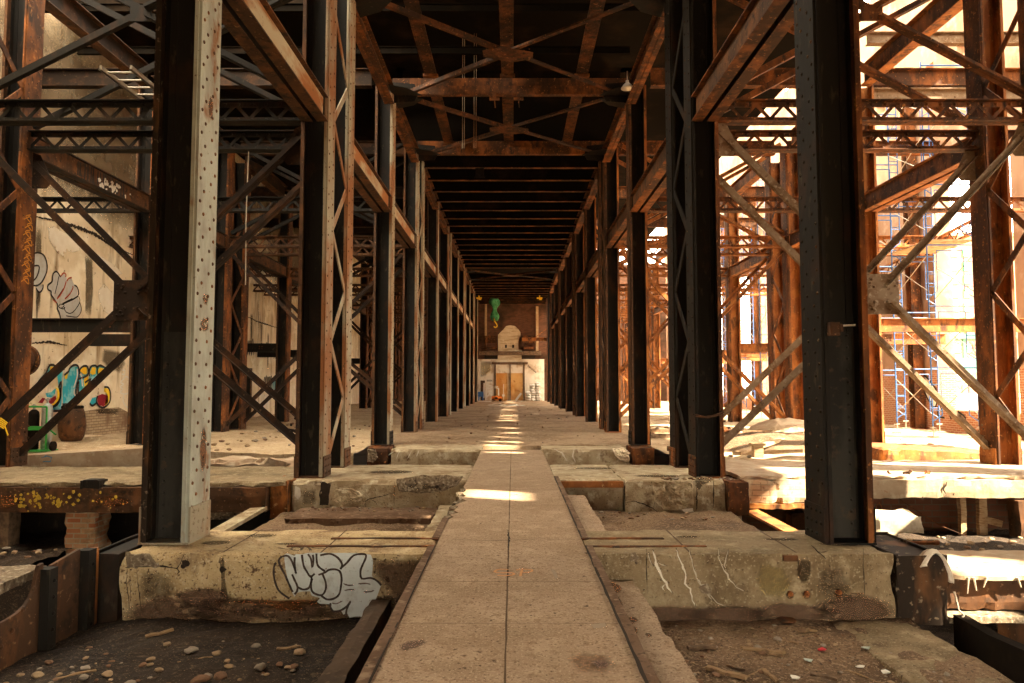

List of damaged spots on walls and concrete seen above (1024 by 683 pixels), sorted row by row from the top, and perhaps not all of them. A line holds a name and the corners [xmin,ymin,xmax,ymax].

spalling [396,475,463,494]
leakage [648,552,672,593]
leakage [652,550,891,622]